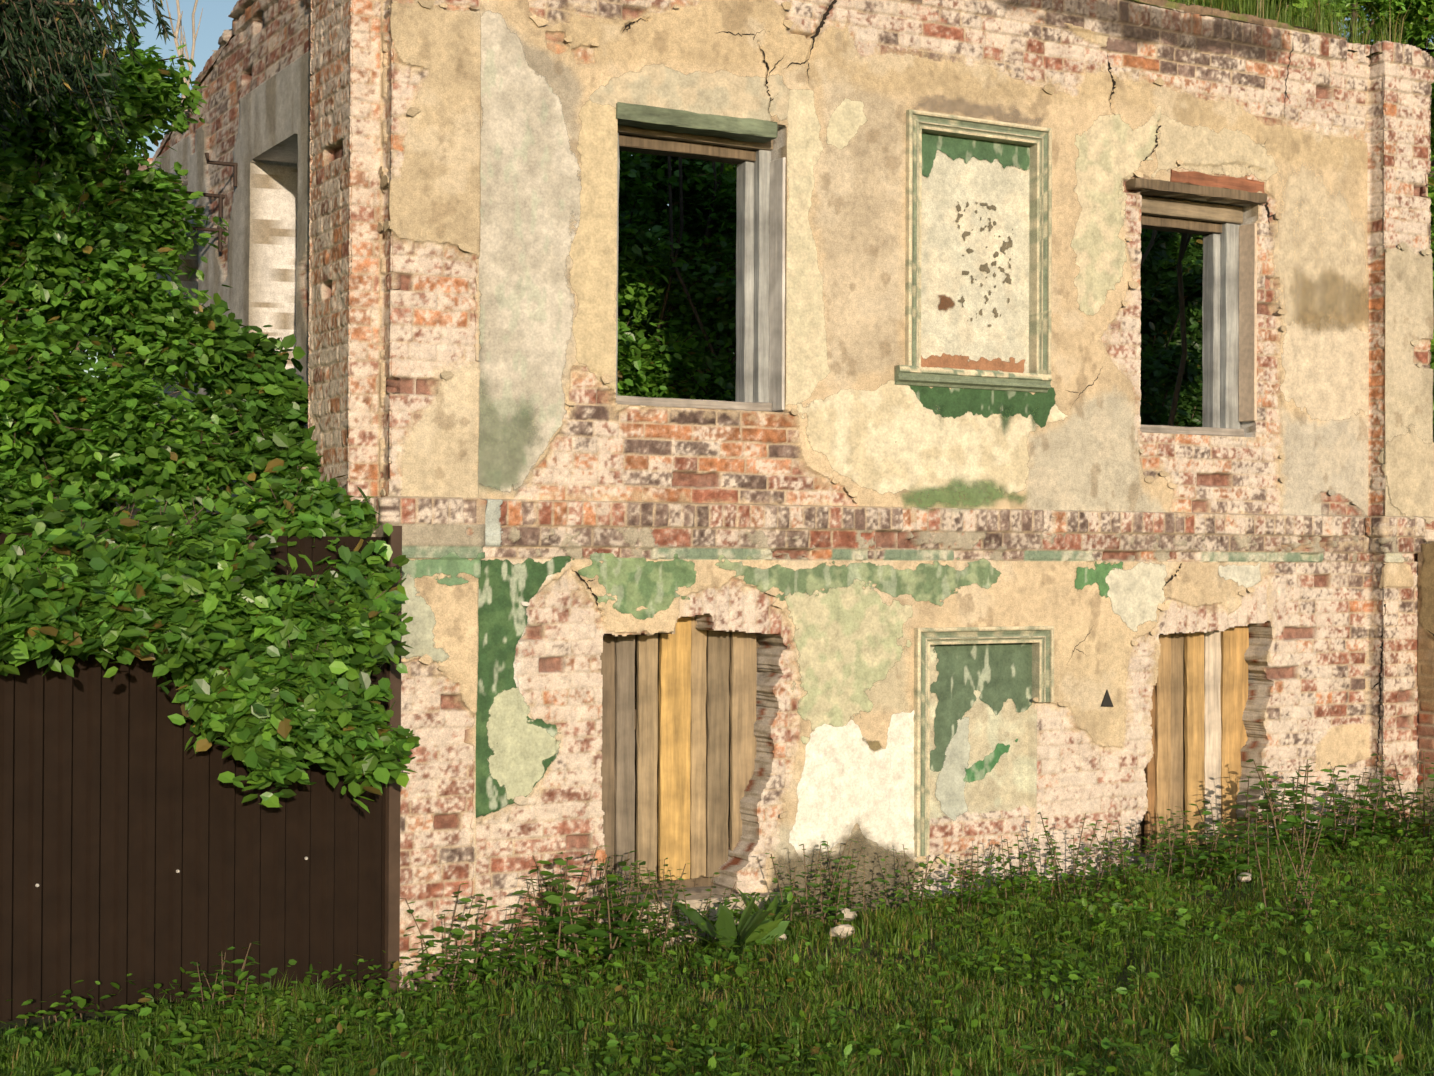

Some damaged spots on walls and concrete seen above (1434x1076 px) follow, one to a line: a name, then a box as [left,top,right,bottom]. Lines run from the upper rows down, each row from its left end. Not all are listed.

peeling [377,0,1068,506]
crack [718,0,837,117]
spalling [774,0,1434,265]
crack [1107,55,1116,114]
peeling [1071,105,1369,516]
water stain [1271,165,1368,327]
spalling [399,552,1001,993]
spalling [904,561,1419,902]